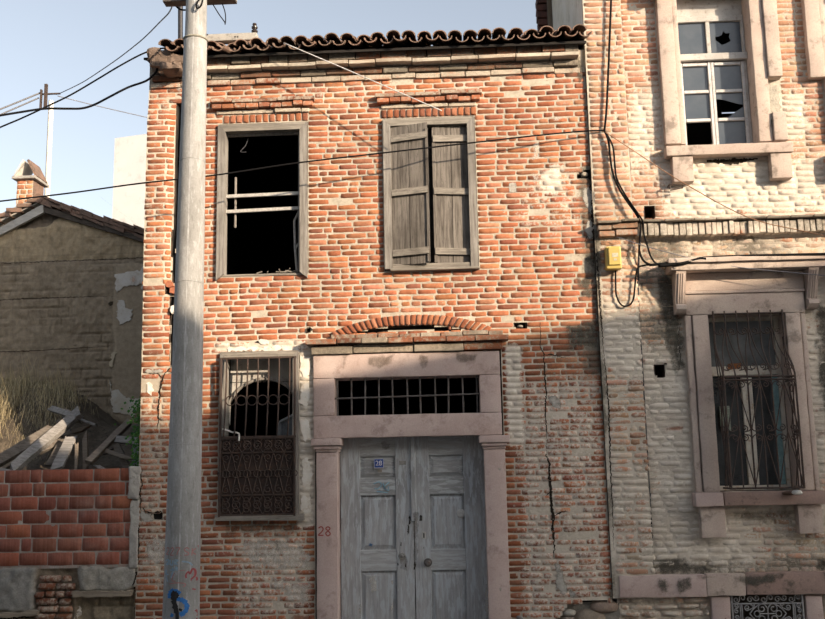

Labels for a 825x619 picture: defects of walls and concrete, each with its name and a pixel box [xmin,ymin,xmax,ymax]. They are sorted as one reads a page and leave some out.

flaking render [109,381,141,417]
flaking render [114,267,143,325]
crack [144,103,181,430]
crack [539,326,567,557]
leakage [658,276,685,373]
leakage [816,304,825,407]
leakage [659,559,710,592]
leakage [740,574,783,586]